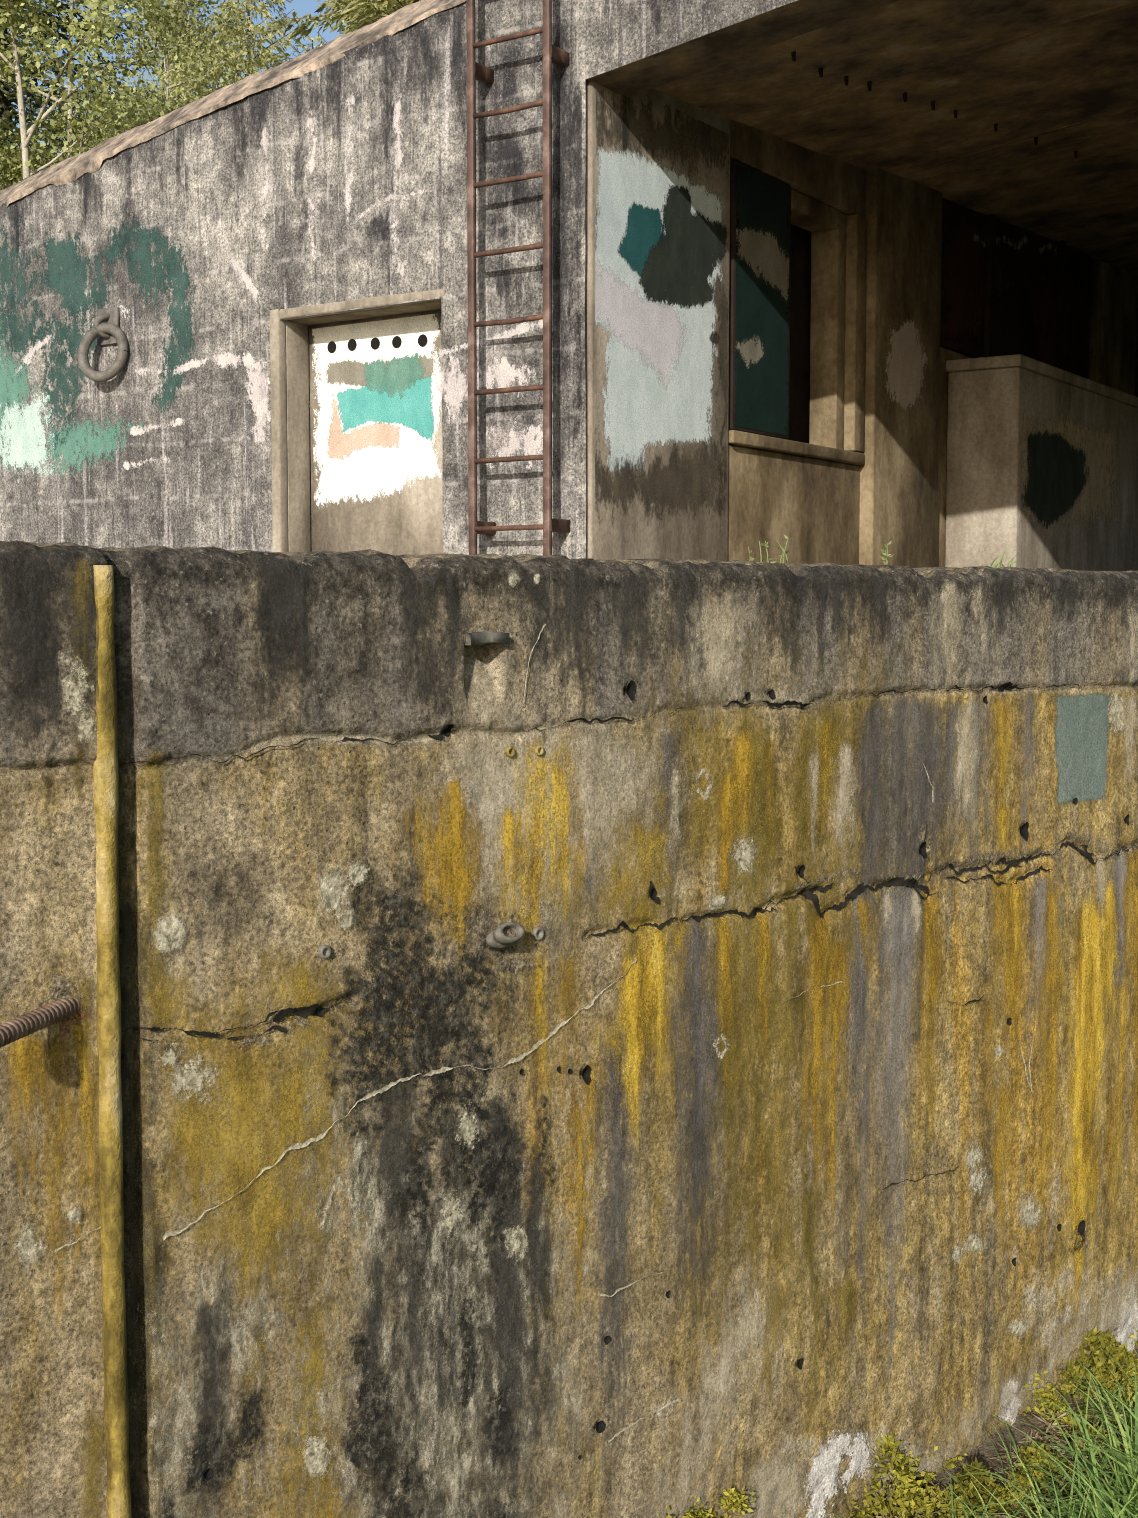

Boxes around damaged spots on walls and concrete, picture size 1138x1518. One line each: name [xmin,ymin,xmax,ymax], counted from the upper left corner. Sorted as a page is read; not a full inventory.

peeling [0,211,197,478]
leakage [130,351,271,444]
leakage [483,27,729,433]
leakage [595,275,728,519]
peeling [595,147,790,473]
crack [122,996,351,1042]
leakage [163,958,355,1301]
leakage [223,558,989,1518]
crack [163,750,1138,1241]
crack [600,1272,664,1297]
crack [608,1398,681,1442]
spalling [803,1429,877,1518]